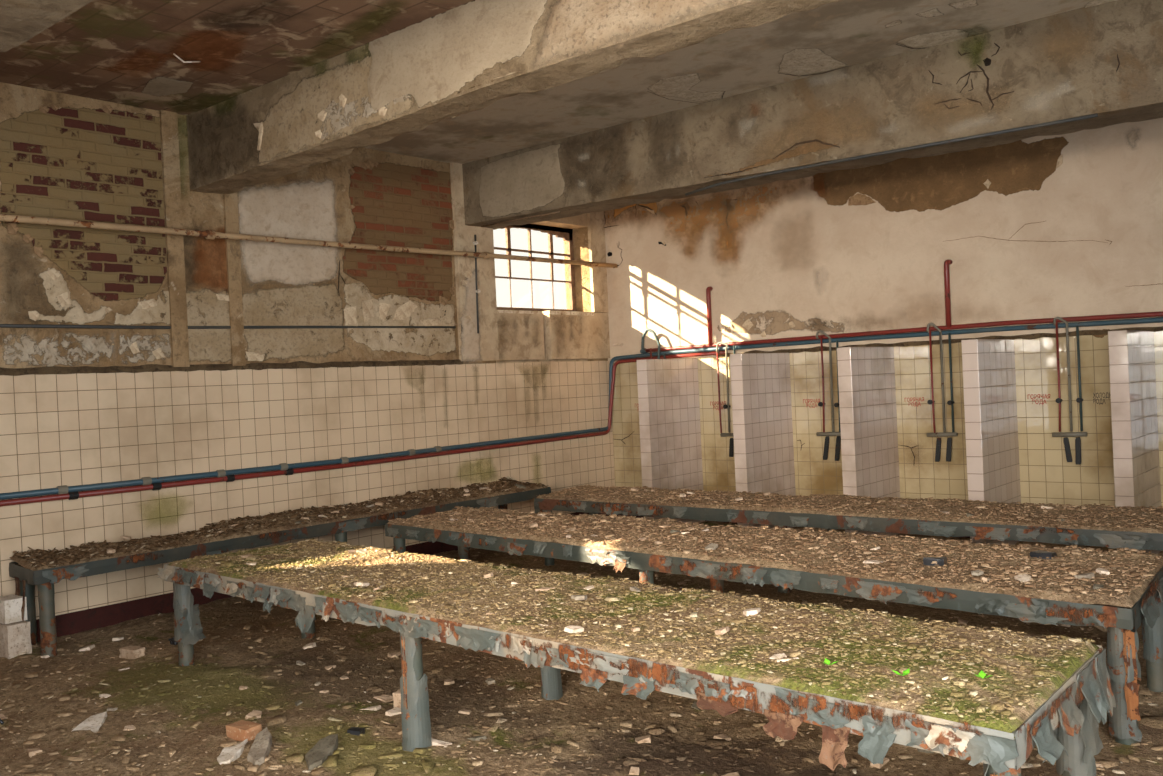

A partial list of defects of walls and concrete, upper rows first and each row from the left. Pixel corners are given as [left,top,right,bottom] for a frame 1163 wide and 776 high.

flaking render [253,0,547,162]
crack [896,43,1014,110]
flaking render [0,104,171,367]
flaking render [186,160,480,362]
leakage [604,180,804,260]
flaking render [813,137,1069,212]